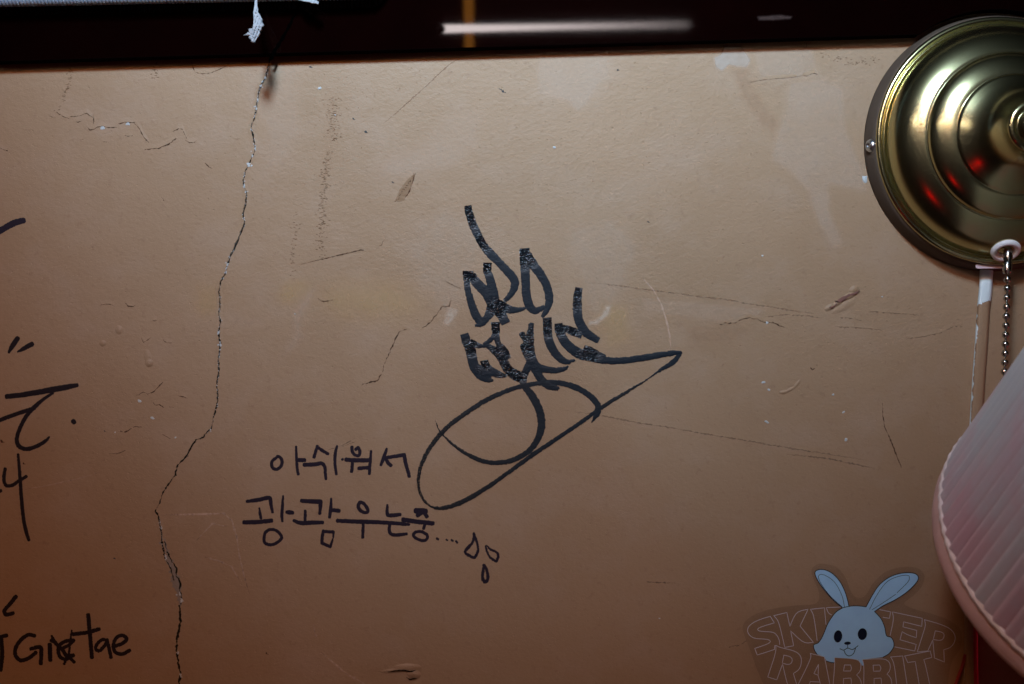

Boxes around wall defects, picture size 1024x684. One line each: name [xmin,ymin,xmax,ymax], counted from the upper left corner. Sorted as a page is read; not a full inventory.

crack [49,108,211,168]
crack [151,1,301,684]
crack [362,281,457,385]
hole [824,285,860,314]